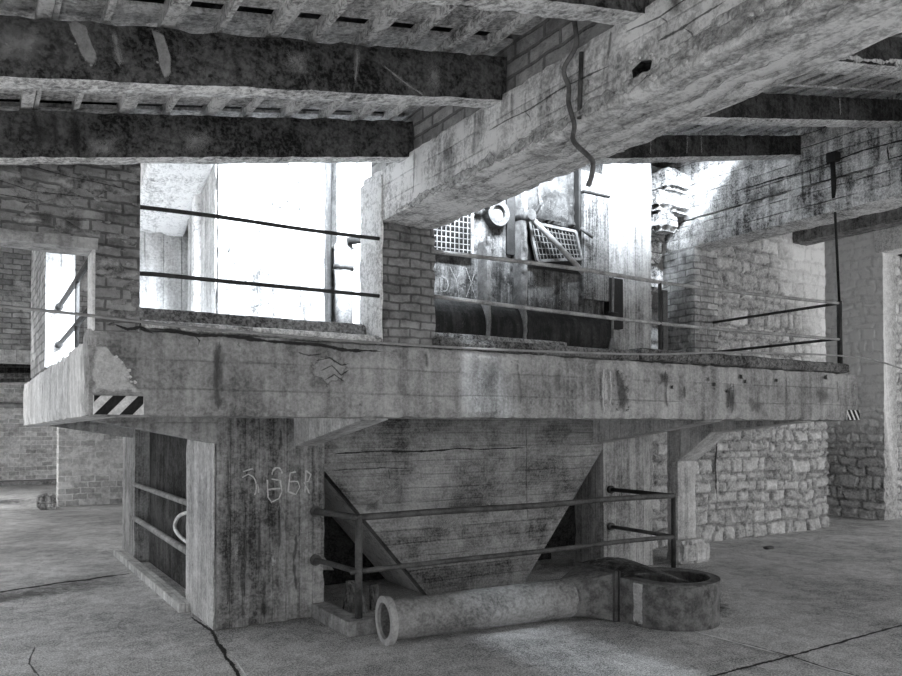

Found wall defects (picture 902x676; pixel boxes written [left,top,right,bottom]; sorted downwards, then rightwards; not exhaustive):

peeling [228,163,315,281]
flaking render [92,345,141,393]
crack [192,617,247,676]
crack [693,625,902,676]